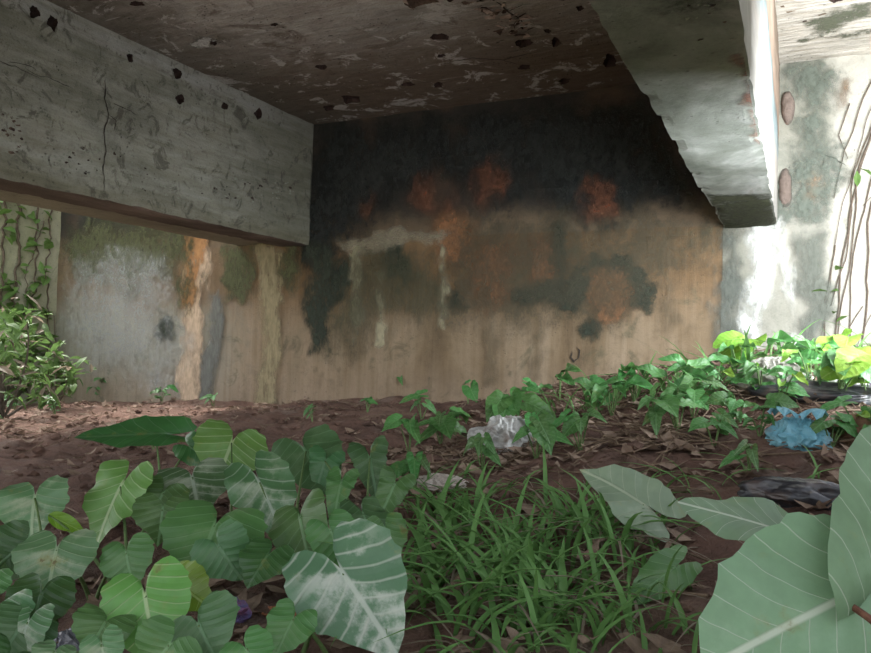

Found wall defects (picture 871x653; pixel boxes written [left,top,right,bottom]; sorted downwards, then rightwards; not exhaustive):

spalling [29,5,58,32]
peeling [403,0,533,49]
damp [798,3,871,43]
crack [102,85,136,188]
damp [63,59,846,404]
rust [181,235,207,306]